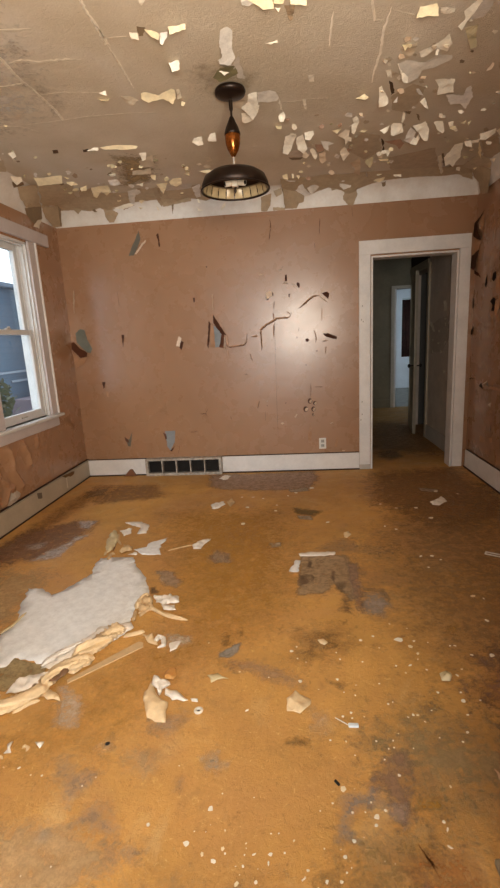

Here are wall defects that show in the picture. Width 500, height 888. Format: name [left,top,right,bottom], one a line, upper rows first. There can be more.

peeling [129,24,186,45]
peeling [227,0,500,211]
peeling [192,133,216,146]
peeling [0,145,213,228]
flaking render [129,231,140,256]